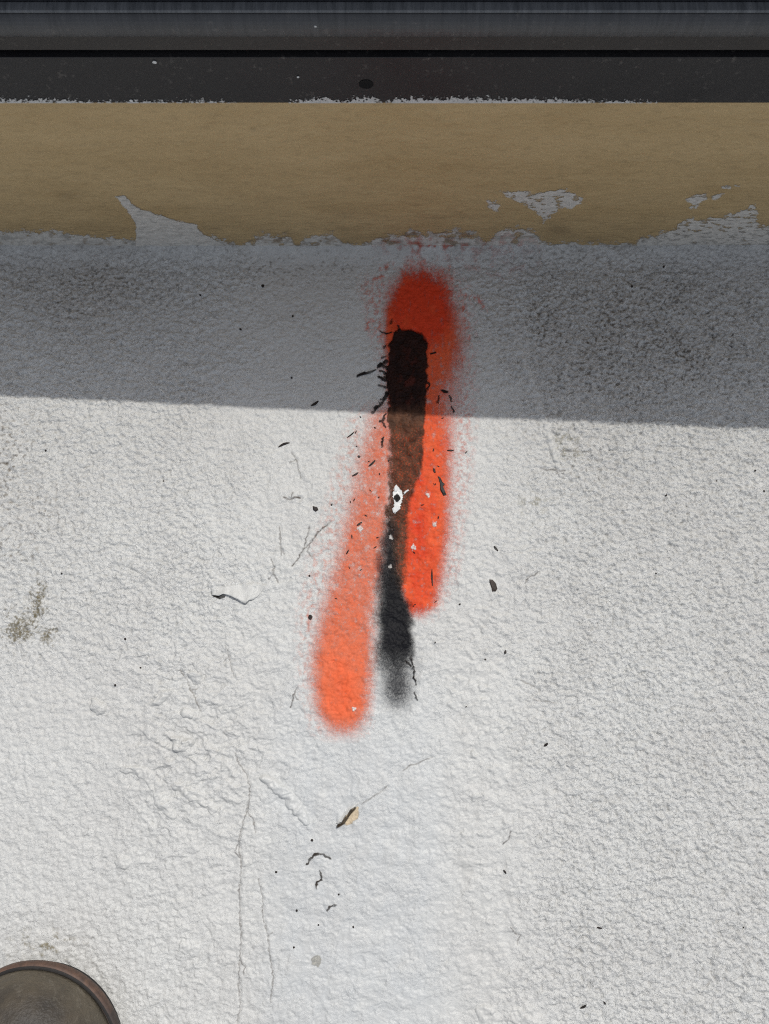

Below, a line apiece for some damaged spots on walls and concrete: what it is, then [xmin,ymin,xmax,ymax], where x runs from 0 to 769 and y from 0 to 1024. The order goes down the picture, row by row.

peeling [0,185,769,247]